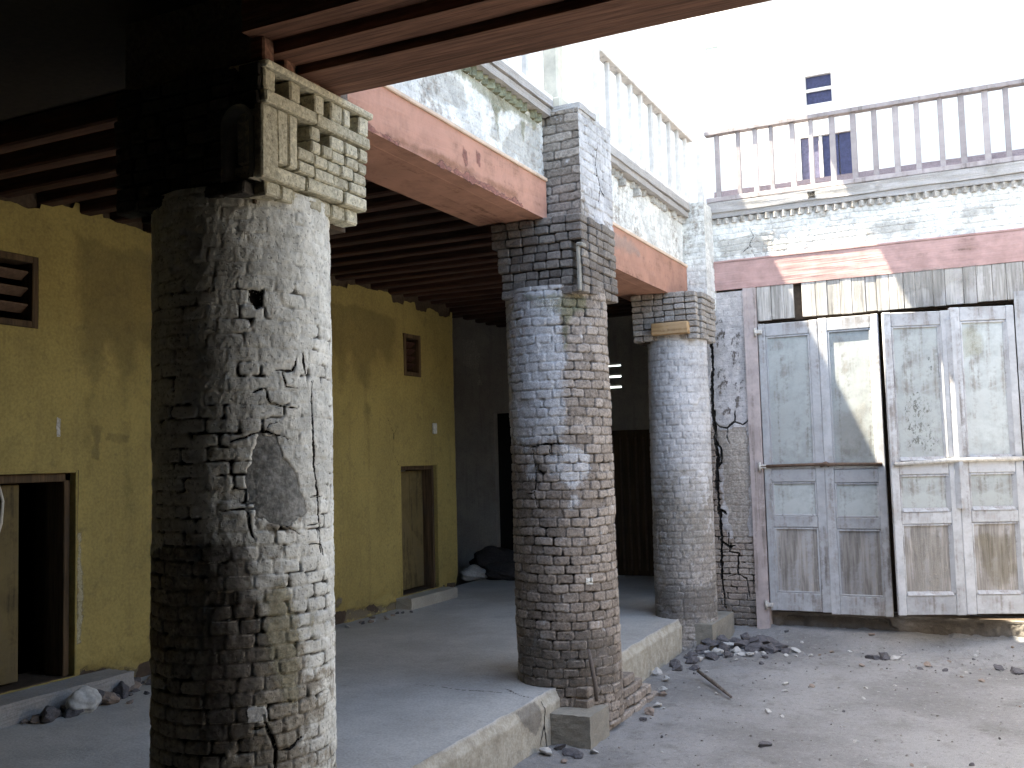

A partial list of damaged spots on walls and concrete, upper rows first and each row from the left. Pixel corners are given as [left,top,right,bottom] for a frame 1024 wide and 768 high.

spalling [239,289,264,309]
crack [219,507,255,539]
spalling [245,433,306,527]
crack [230,353,324,556]
crack [709,344,750,608]